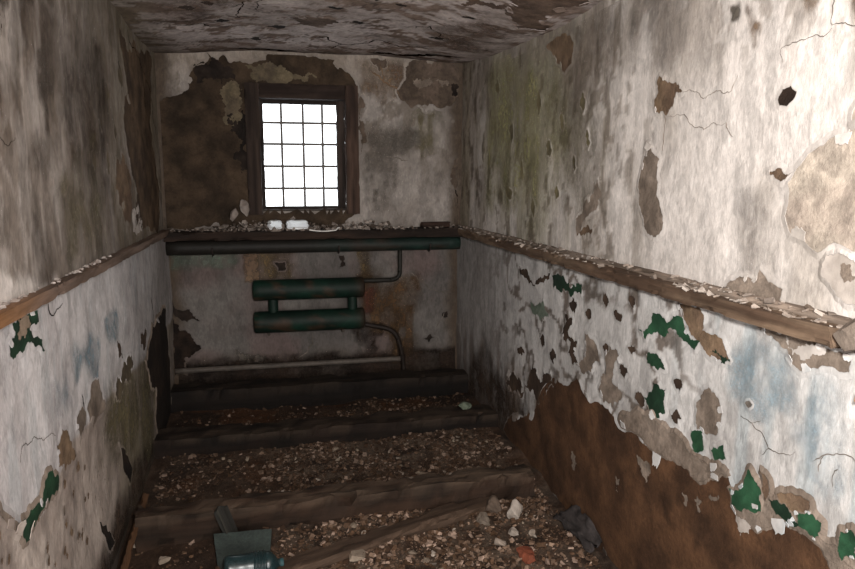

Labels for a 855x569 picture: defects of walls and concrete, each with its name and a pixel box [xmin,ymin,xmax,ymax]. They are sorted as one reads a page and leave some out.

peeling [264,5,368,29]
peeling [458,0,594,77]
crack [780,0,855,61]
damp [37,45,51,113]
crack [662,114,733,151]
flaking render [114,24,855,328]
flaking render [0,275,204,549]
flaking render [503,263,855,569]
crack [742,417,855,486]
flaking render [98,518,115,555]